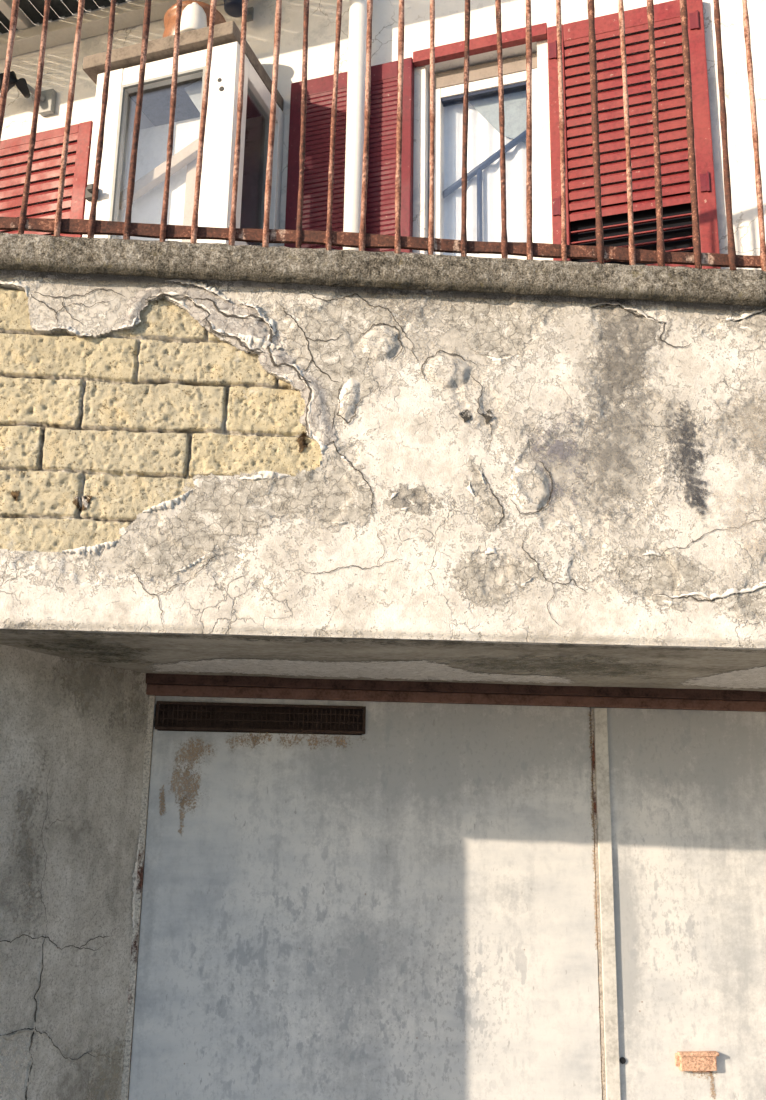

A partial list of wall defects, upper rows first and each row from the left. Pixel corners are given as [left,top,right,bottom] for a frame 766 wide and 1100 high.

spalling [0,280,29,296]
peeling [62,278,443,584]
leakage [665,402,707,515]
crack [131,551,234,624]
crack [652,582,766,602]
corrosion [159,739,213,833]
crack [0,767,121,1100]